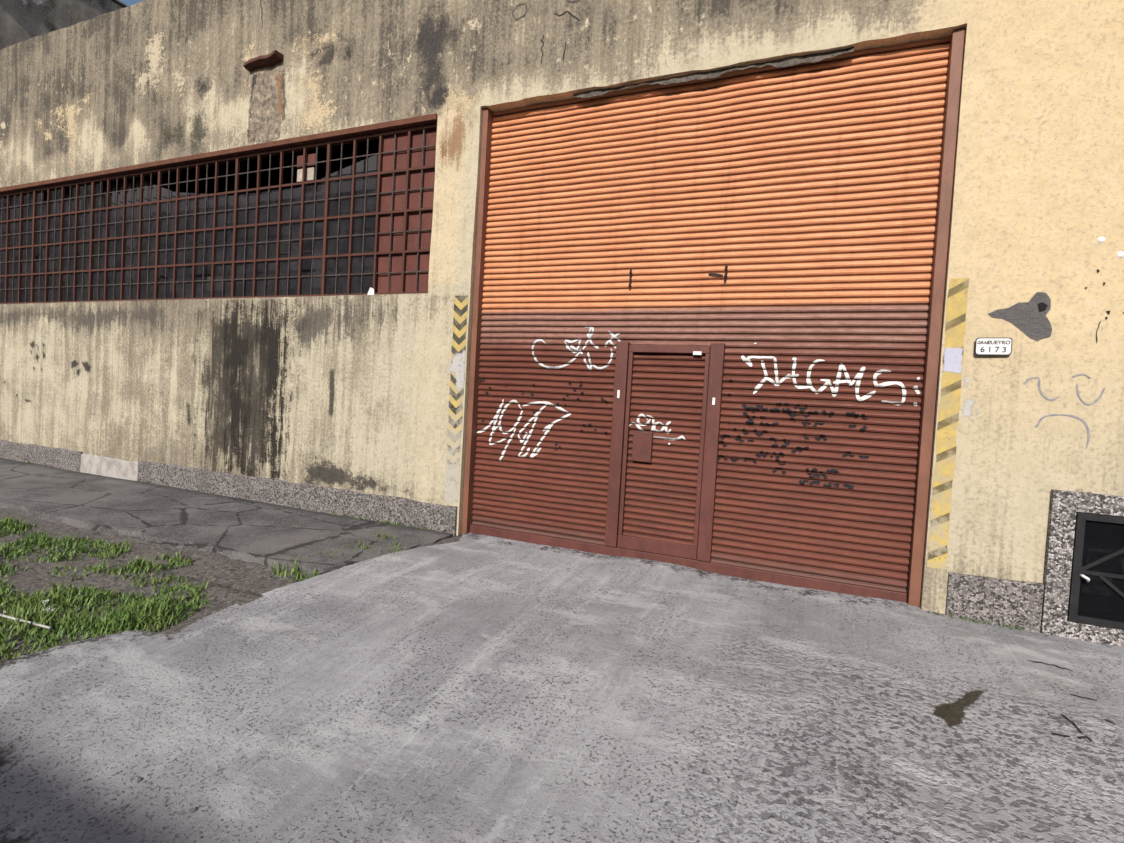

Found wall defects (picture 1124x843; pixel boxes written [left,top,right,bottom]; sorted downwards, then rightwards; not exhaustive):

water stain [310,43,350,65]
water stain [186,296,397,479]
water stain [304,457,413,495]